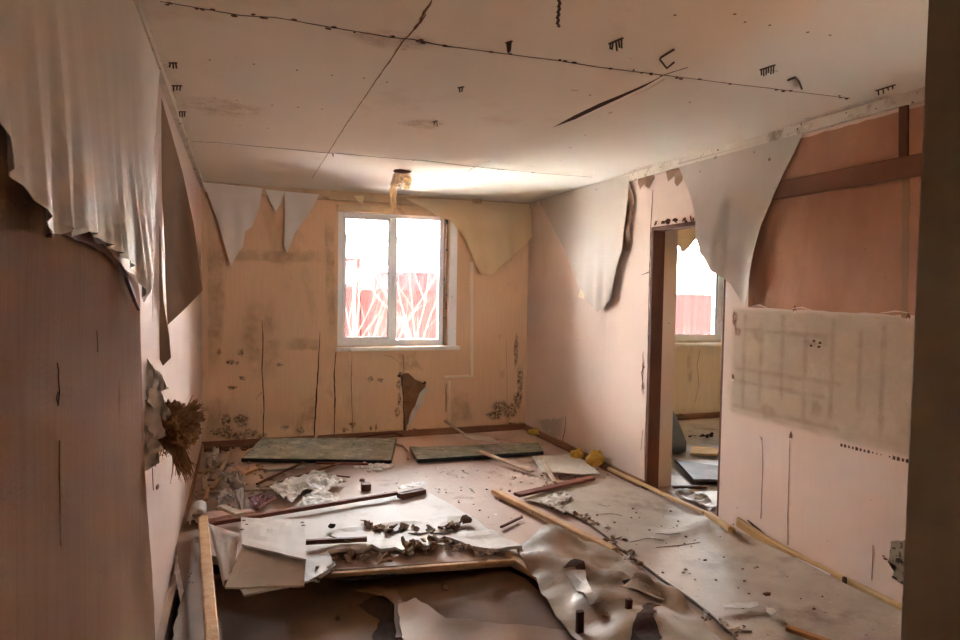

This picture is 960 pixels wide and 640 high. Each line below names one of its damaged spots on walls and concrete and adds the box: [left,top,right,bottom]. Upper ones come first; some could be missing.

crack [160,0,848,178]
crack [54,363,62,406]
crack [257,326,265,437]
mould [485,331,524,424]
crack [757,437,765,519]